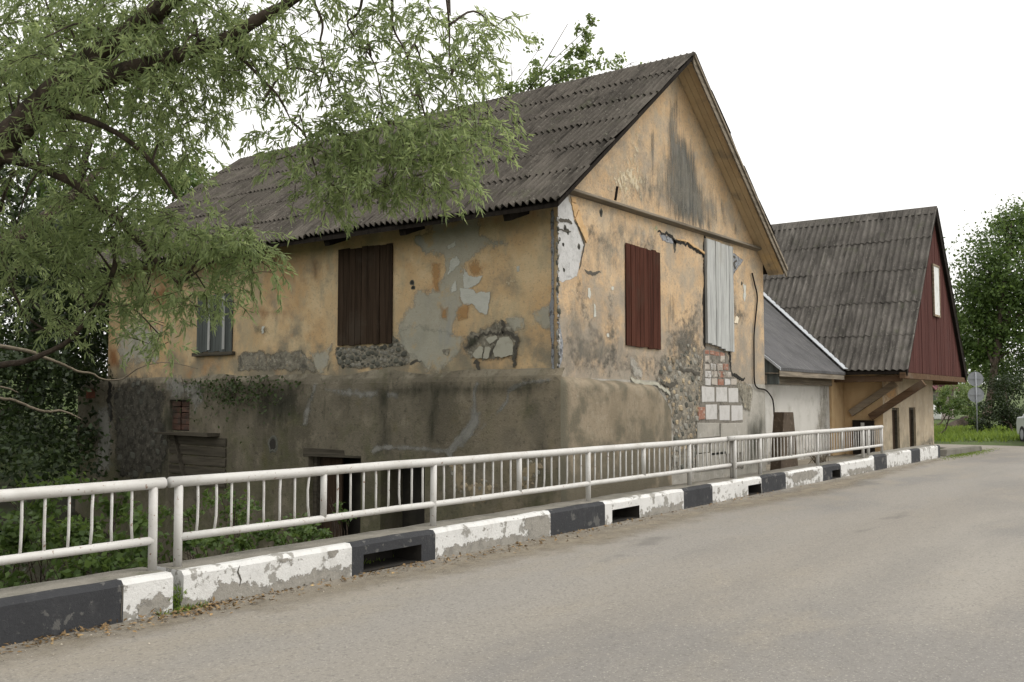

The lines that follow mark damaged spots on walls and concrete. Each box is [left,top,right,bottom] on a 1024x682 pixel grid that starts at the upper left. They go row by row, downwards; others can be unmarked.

leakage [667,119,710,228]
peeling [237,196,588,373]
crack [658,230,745,382]
flaking render [631,343,753,470]
peeling [136,550,351,618]
peeling [436,515,551,559]